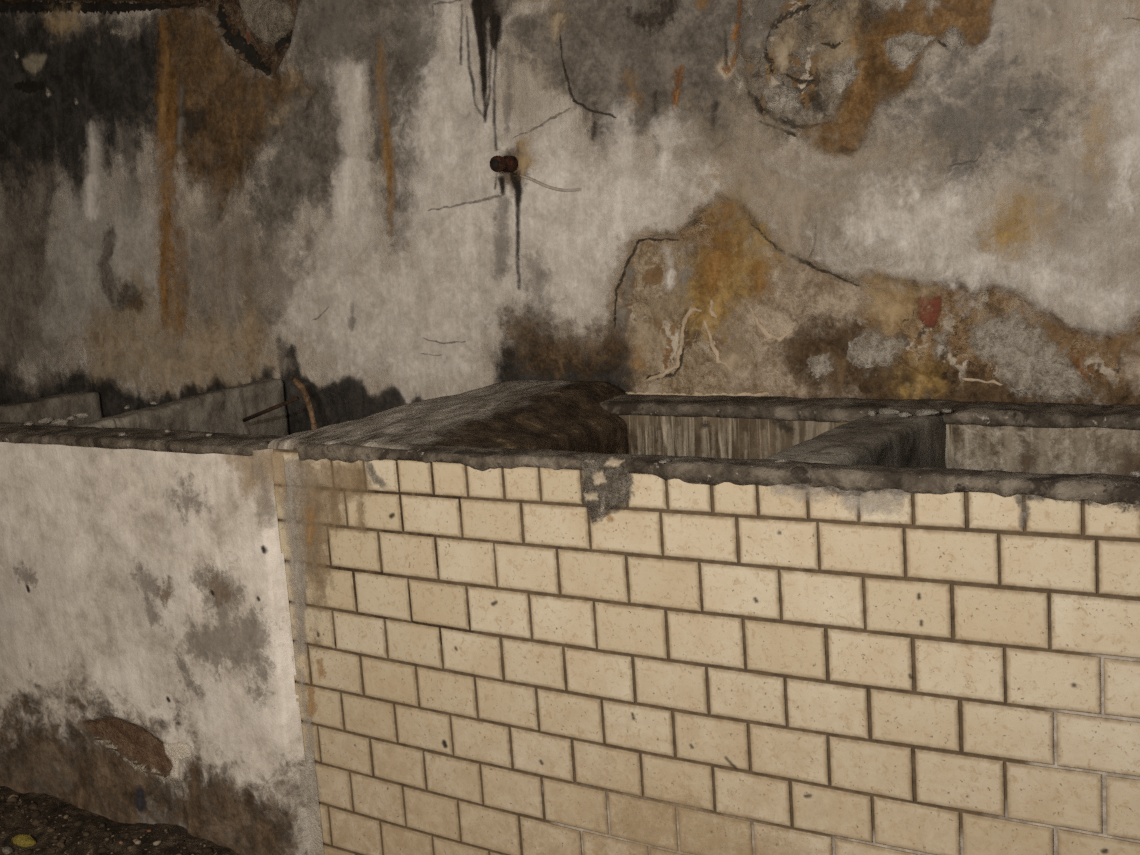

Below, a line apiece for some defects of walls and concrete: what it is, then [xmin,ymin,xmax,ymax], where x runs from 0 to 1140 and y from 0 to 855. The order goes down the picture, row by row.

crack [520,33,616,134]
peeling [803,0,994,157]
rust [158,20,188,333]
damp [0,0,1140,400]
peeling [607,194,1140,405]
peeling [584,459,622,501]
spalling [87,717,192,785]
damp [0,673,316,855]